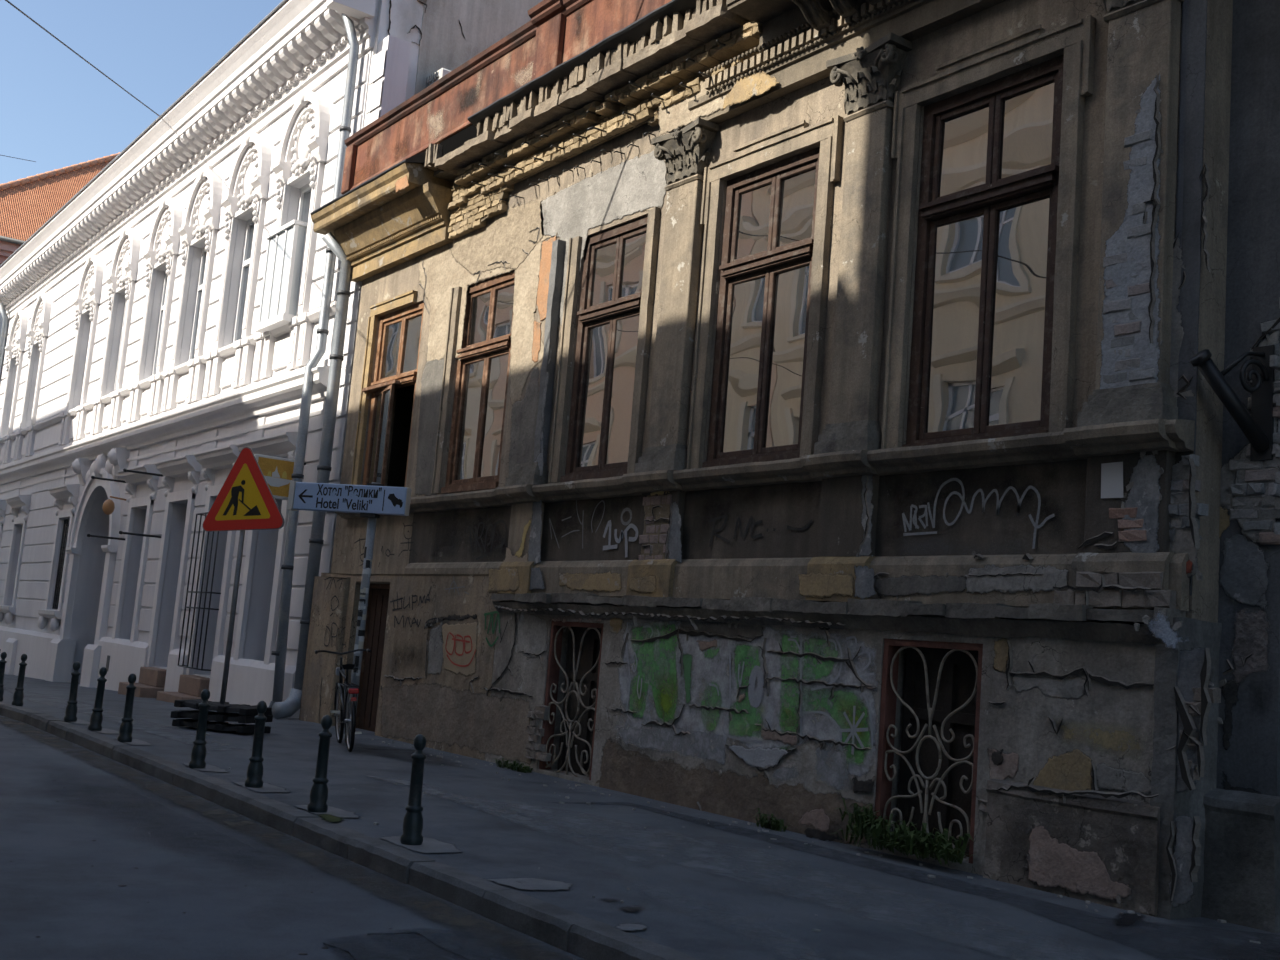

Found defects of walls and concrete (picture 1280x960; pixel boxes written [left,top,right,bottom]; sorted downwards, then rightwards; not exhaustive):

flaking render [419,21,779,405]
flaking render [1100,72,1164,389]
flaking render [639,493,672,561]
crack [468,605,876,784]
flaking render [1022,825,1132,903]
flaking render [1053,571,1183,631]
crack [988,640,1252,901]
flaking render [1109,297,1280,553]